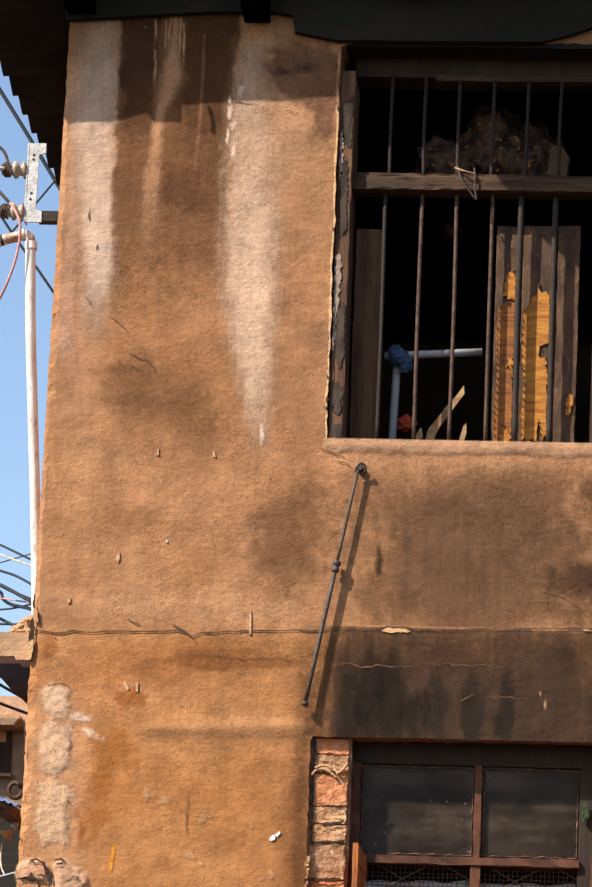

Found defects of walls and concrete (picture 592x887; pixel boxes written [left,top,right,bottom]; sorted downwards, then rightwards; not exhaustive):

damp [59,14,339,444]
damp [365,482,592,628]
spalling [33,683,75,846]
crack [26,594,592,668]
crack [455,693,532,704]
spalling [15,858,51,887]